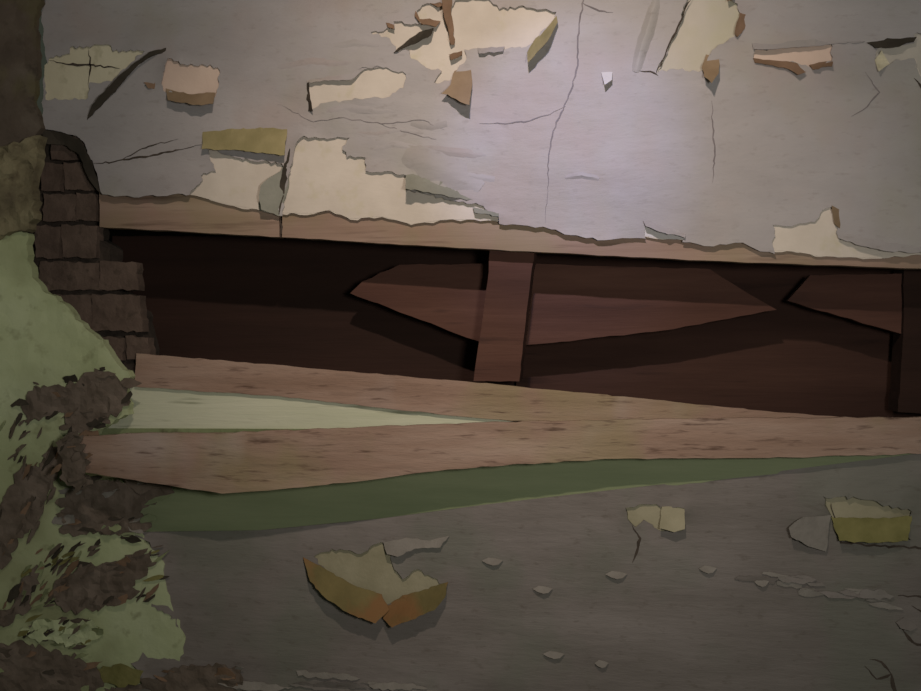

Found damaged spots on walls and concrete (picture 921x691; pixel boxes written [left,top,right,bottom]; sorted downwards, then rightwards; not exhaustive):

peeling [44,45,220,119]
peeling [306,66,406,111]
peeling [371,0,558,105]
crack [479,0,609,219]
peeling [656,0,746,83]
peeling [752,33,921,88]
peeling [190,127,499,224]
peeling [772,206,921,258]
spalling [0,130,449,691]
peeling [789,496,912,551]
crack [902,629,921,646]
crack [865,659,897,691]